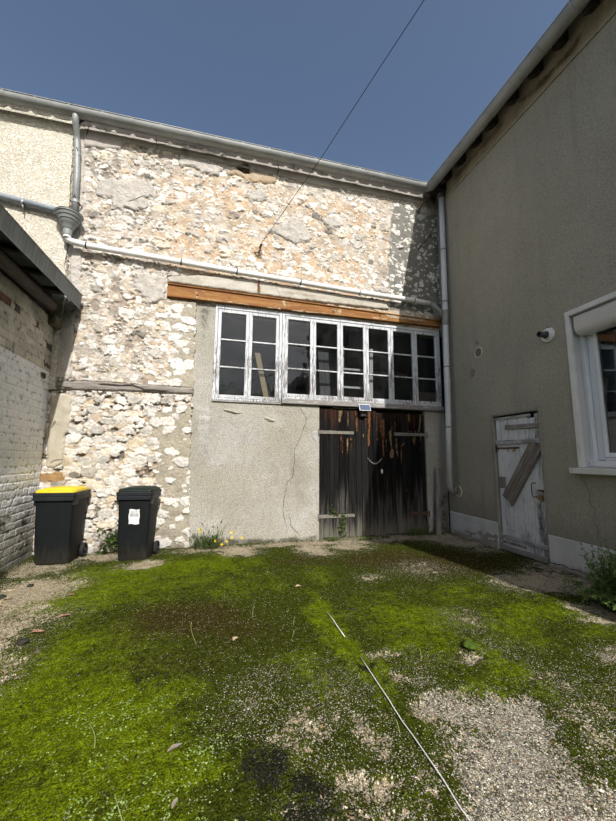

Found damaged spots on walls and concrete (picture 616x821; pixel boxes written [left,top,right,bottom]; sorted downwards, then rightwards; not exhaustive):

crack [283,406,308,534]